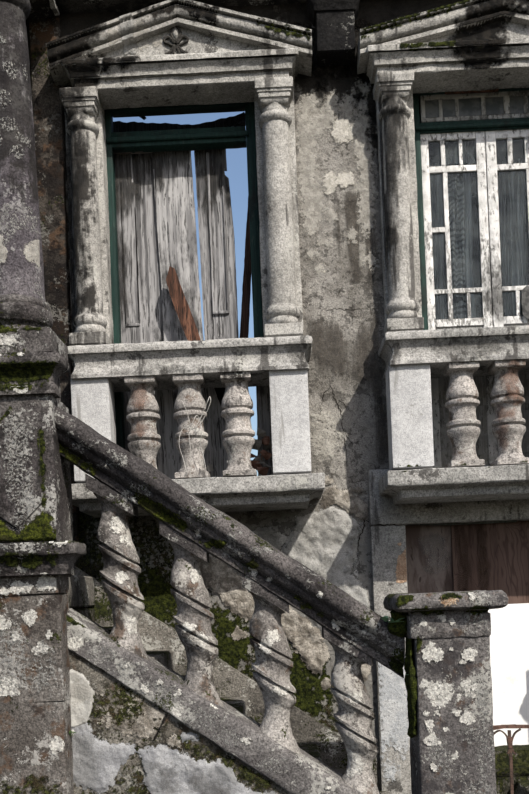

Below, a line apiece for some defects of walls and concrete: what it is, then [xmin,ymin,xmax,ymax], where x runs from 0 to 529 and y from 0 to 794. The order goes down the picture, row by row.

water stain [447,0,529,81]
water stain [46,23,141,332]
water stain [114,149,230,217]
water stain [294,19,409,284]
crack [322,375,355,466]
spalling [280,605,333,690]
flaking render [69,669,277,794]